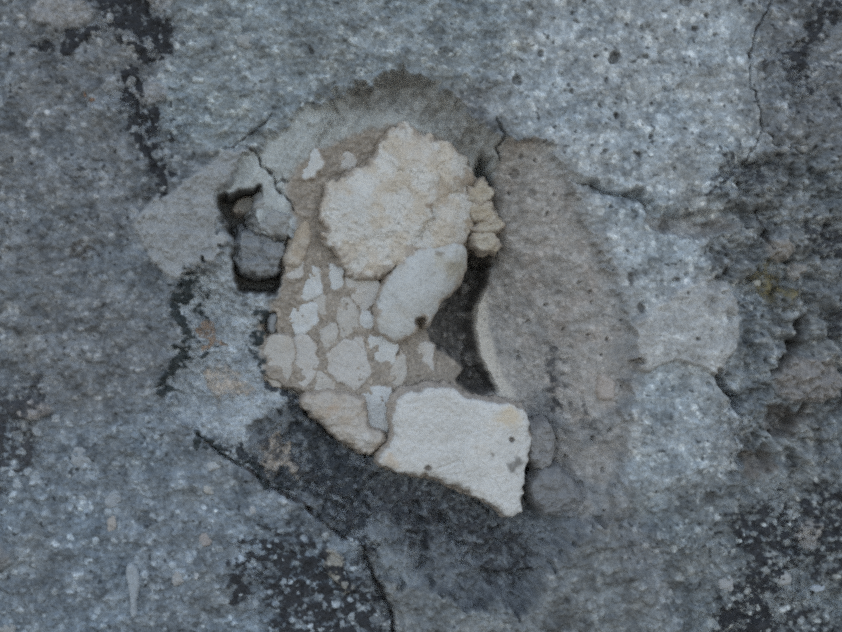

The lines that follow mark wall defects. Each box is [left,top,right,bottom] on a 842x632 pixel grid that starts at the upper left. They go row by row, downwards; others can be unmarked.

crack [205,440,395,632]
spalling [132,66,740,632]